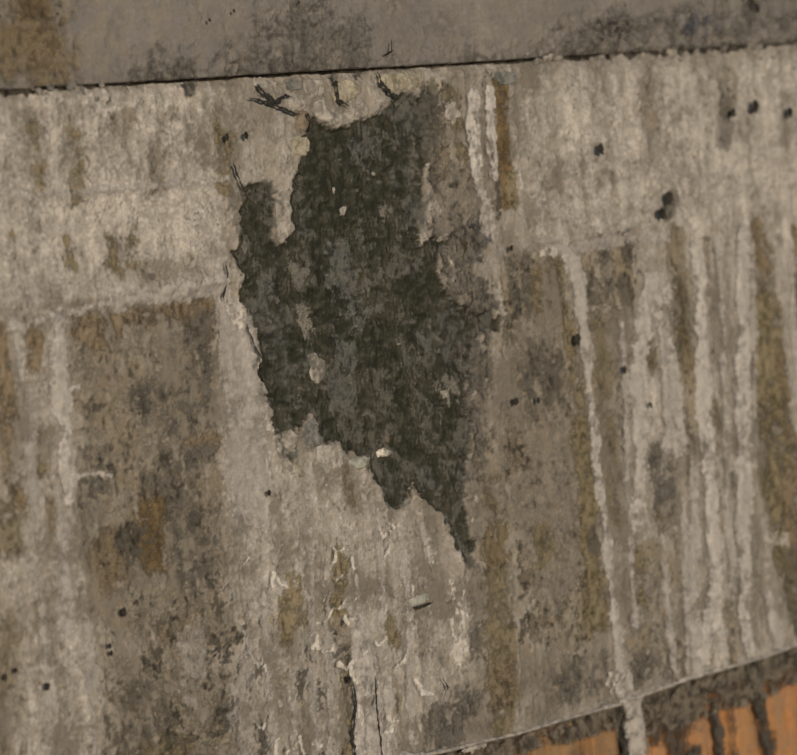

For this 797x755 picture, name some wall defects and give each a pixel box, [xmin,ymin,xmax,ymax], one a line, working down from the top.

damp [637,65,664,162]
damp [717,61,739,118]
spalling [230,70,507,564]
damp [0,215,797,755]
flaking render [302,540,361,654]
flaking render [274,726,305,755]
flaking render [337,654,359,685]
flaking render [336,703,364,737]
crack [349,686,357,755]
crack [375,675,383,755]
flaking render [382,710,399,734]
flaking render [413,678,434,696]